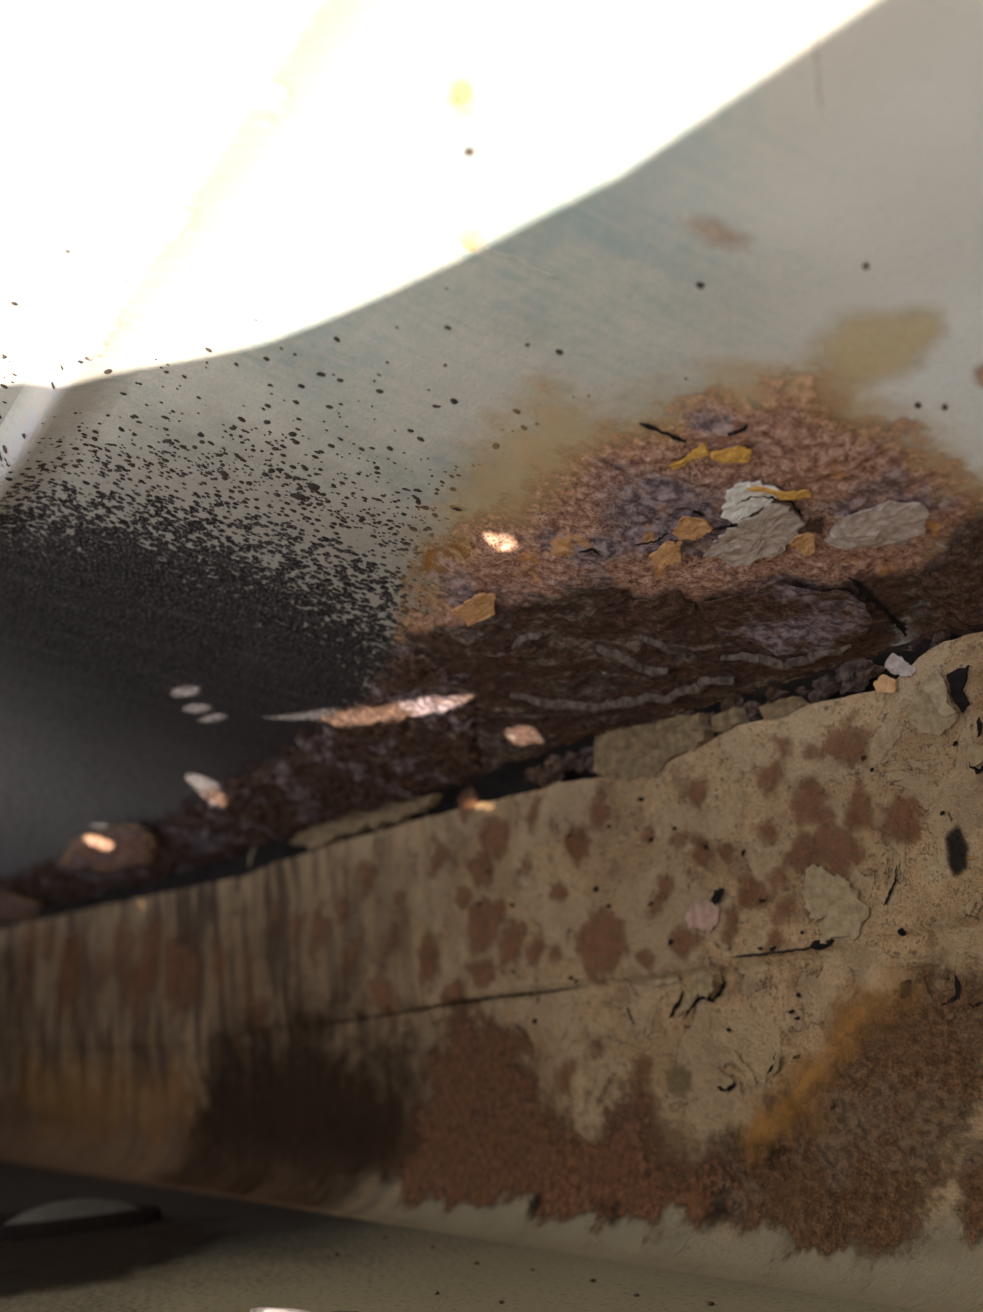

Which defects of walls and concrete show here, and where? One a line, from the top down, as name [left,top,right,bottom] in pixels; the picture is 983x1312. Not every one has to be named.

corrosion [0,373,983,908]
crack [316,984,590,1037]
corrosion [393,818,983,1268]
crack [730,939,834,958]
corrosion [722,778,919,951]